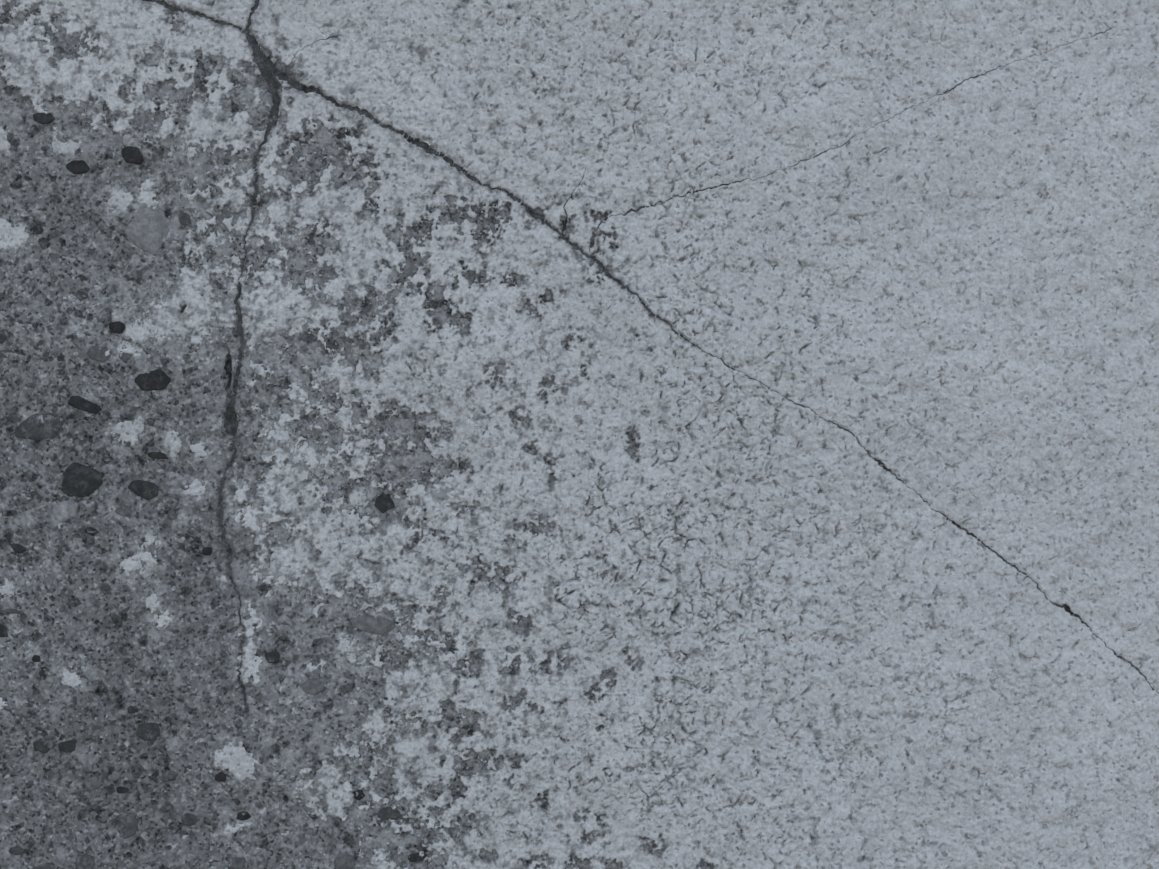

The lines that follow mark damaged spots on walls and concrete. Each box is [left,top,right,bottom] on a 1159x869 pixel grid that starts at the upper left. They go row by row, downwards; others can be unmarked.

peeling [0,0,103,68]
peeling [525,195,618,283]
crack [143,0,1159,719]
peeling [0,43,573,869]
peeling [625,426,640,462]
peeling [585,646,644,703]
peeling [565,808,622,869]
peeling [640,835,666,857]